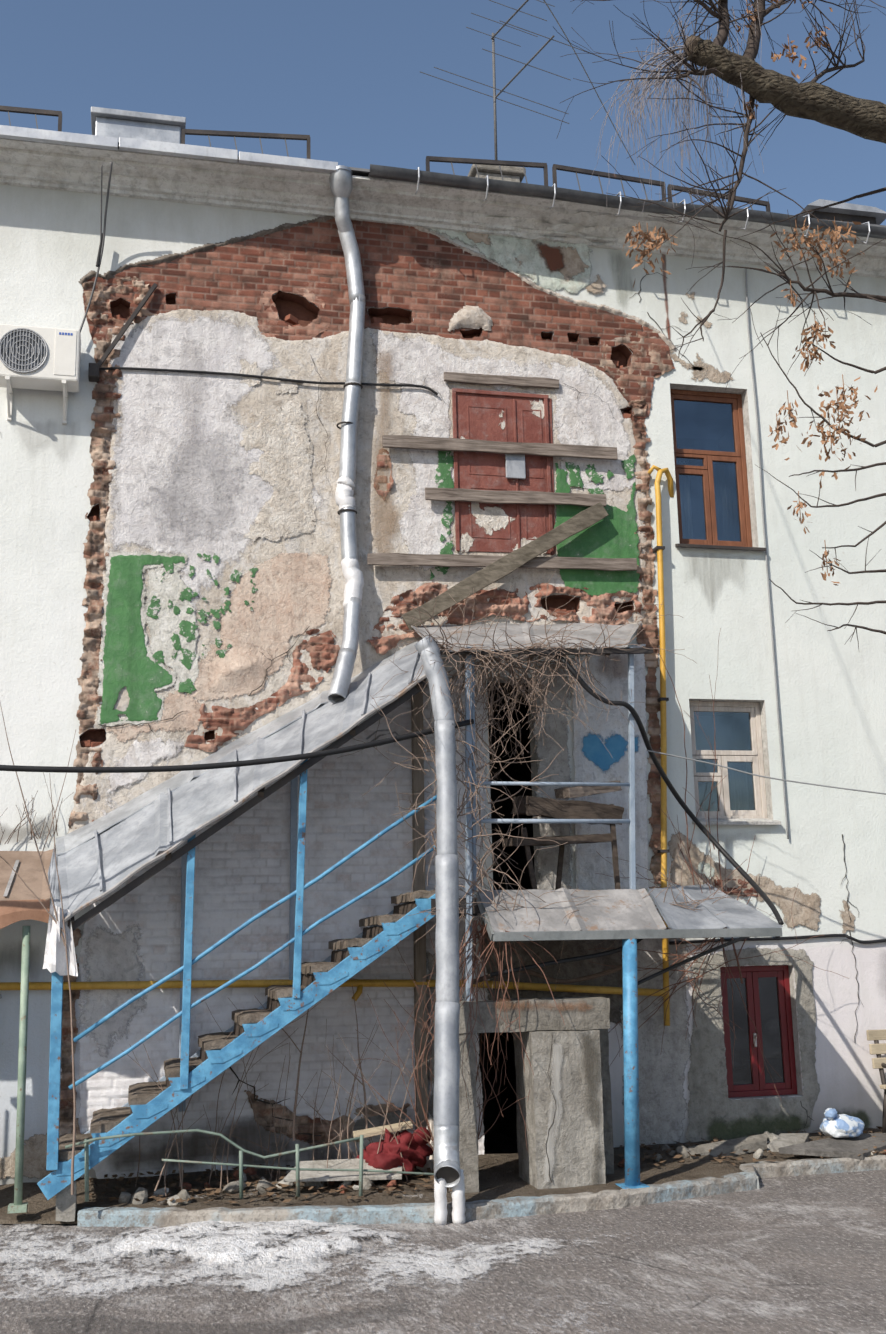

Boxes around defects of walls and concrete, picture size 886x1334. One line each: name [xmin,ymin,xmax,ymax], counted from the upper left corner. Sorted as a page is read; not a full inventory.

peeling [67,216,821,931]
spalling [839,900,855,933]
crack [840,834,864,1040]
flaking render [0,928,81,1179]
spalling [244,1090,410,1145]